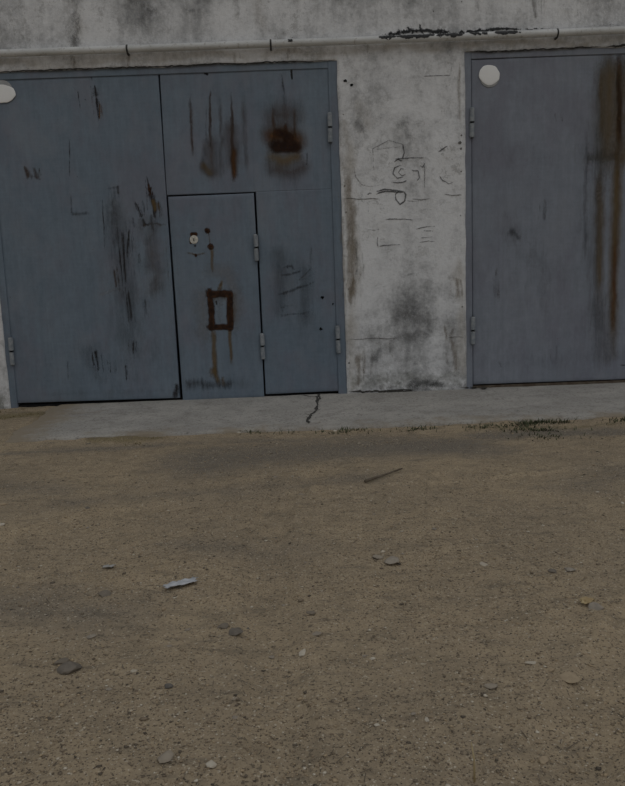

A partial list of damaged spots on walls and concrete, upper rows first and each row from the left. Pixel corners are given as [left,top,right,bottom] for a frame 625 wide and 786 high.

corrosion [264,108,308,174]
corrosion [596,62,625,329]
corrosion [205,281,234,382]
crack [302,394,321,423]